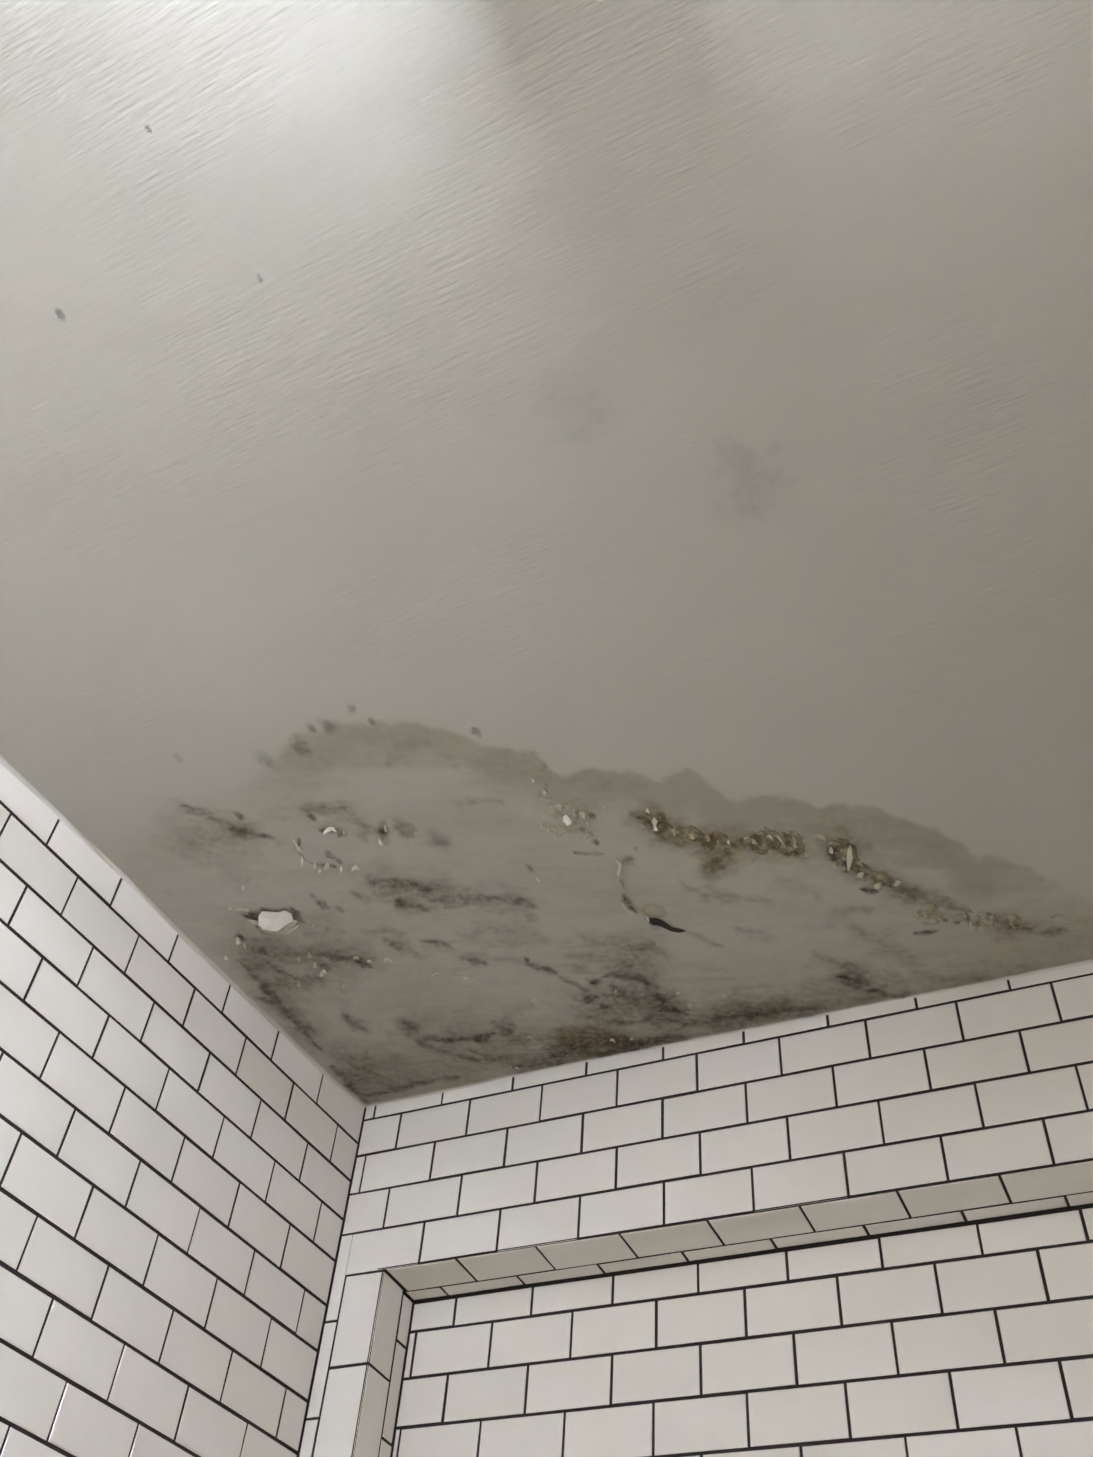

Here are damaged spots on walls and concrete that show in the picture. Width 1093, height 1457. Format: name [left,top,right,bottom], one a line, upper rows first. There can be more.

peeling [531,763,612,844]
peeling [638,808,909,893]
peeling [224,908,330,960]
peeling [913,901,1023,934]